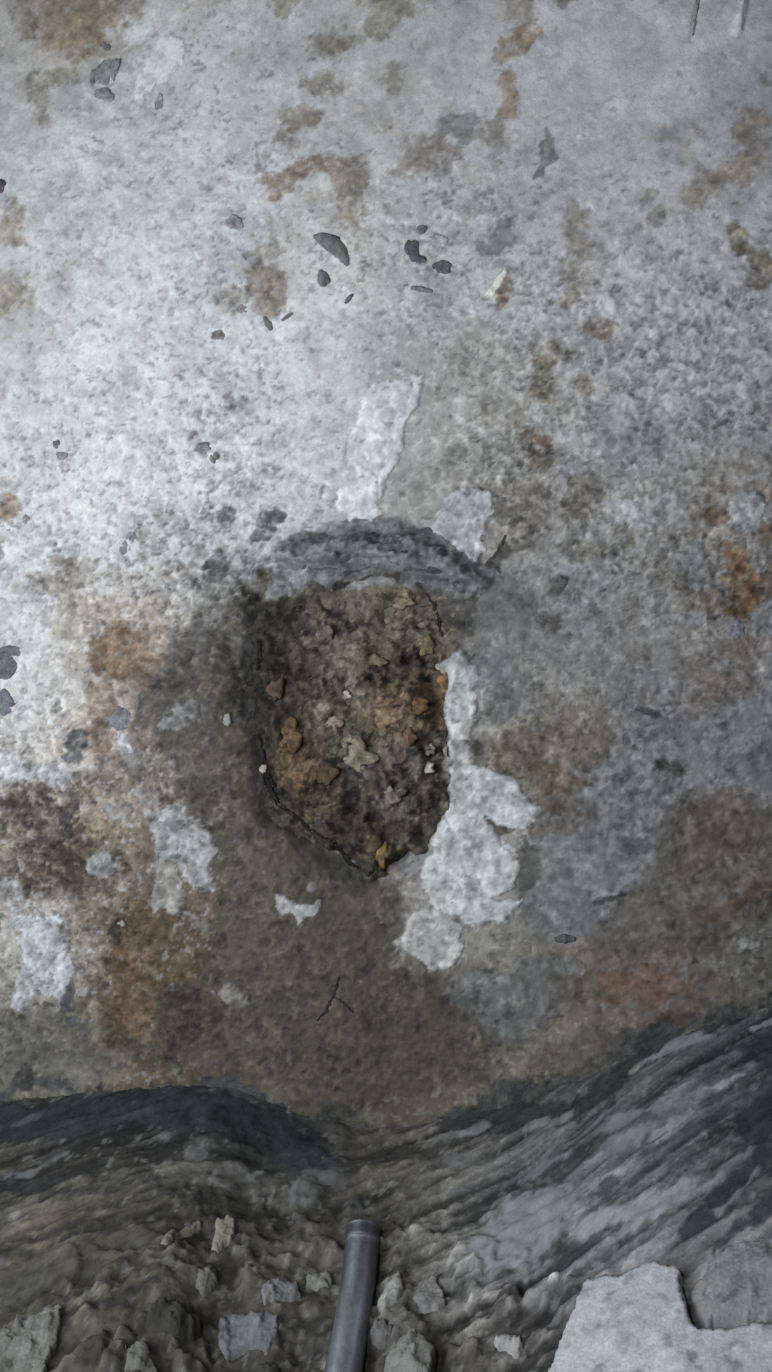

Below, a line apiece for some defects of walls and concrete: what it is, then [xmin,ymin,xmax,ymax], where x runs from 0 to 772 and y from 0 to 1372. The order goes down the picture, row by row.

crack [691,0,699,36]
flaking render [194,442,219,463]
flaking render [119,532,137,557]
flaking render [601,498,672,530]
corrosion [704,507,728,526]
corrosion [682,524,772,617]
flaking render [244,374,569,971]
flaking render [0,729,88,821]
flaking render [102,549,237,914]
flaking render [86,841,117,878]
leakage [0,570,772,1255]
leakage [0,1218,157,1314]